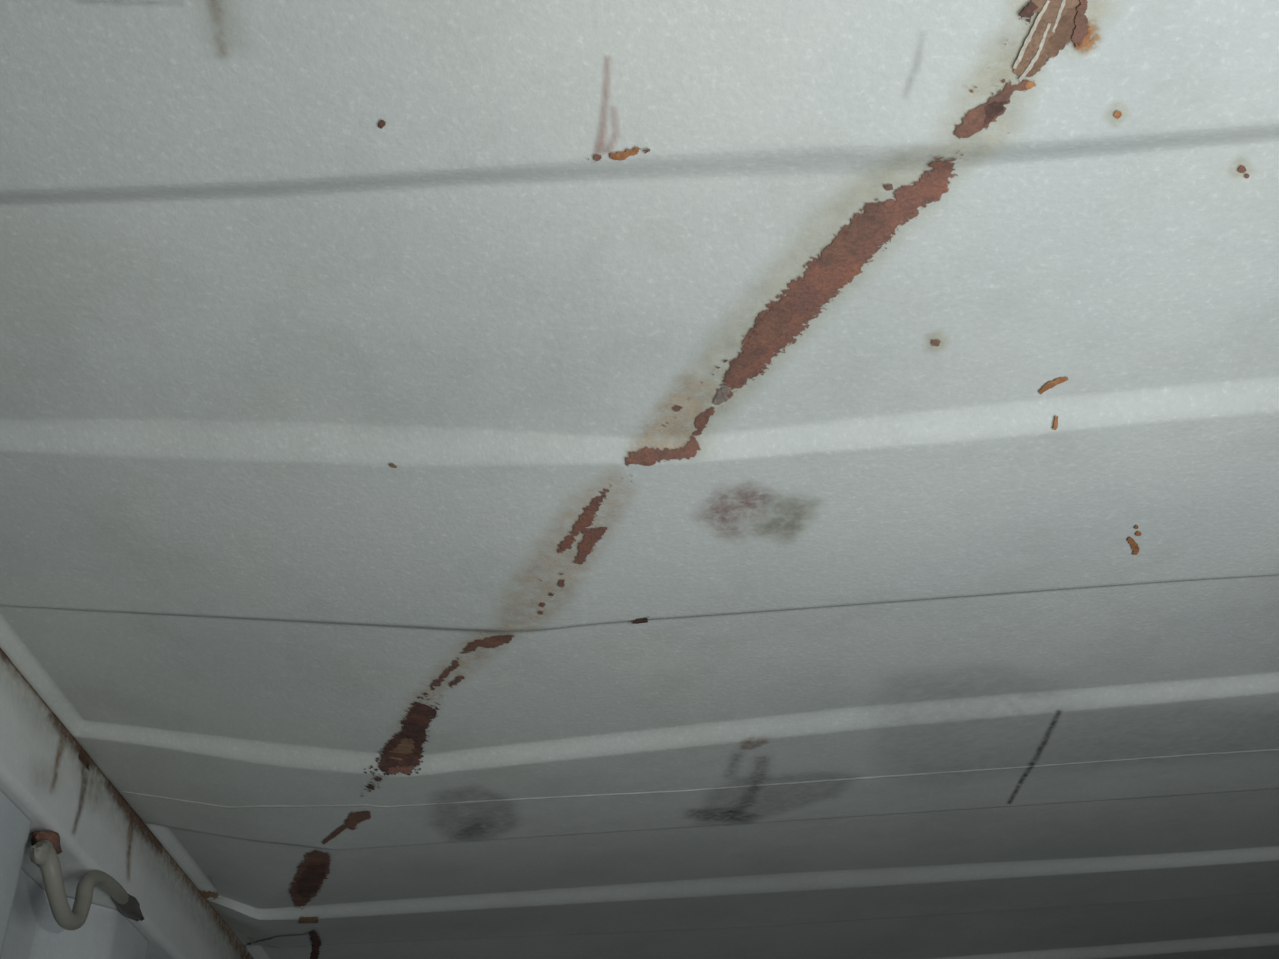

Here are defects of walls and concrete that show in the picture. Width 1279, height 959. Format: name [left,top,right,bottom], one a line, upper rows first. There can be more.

corrosion [588,134,650,162]
corrosion [1039,377,1068,394]
corrosion [1127,525,1142,555]
corrosion [0,648,252,959]